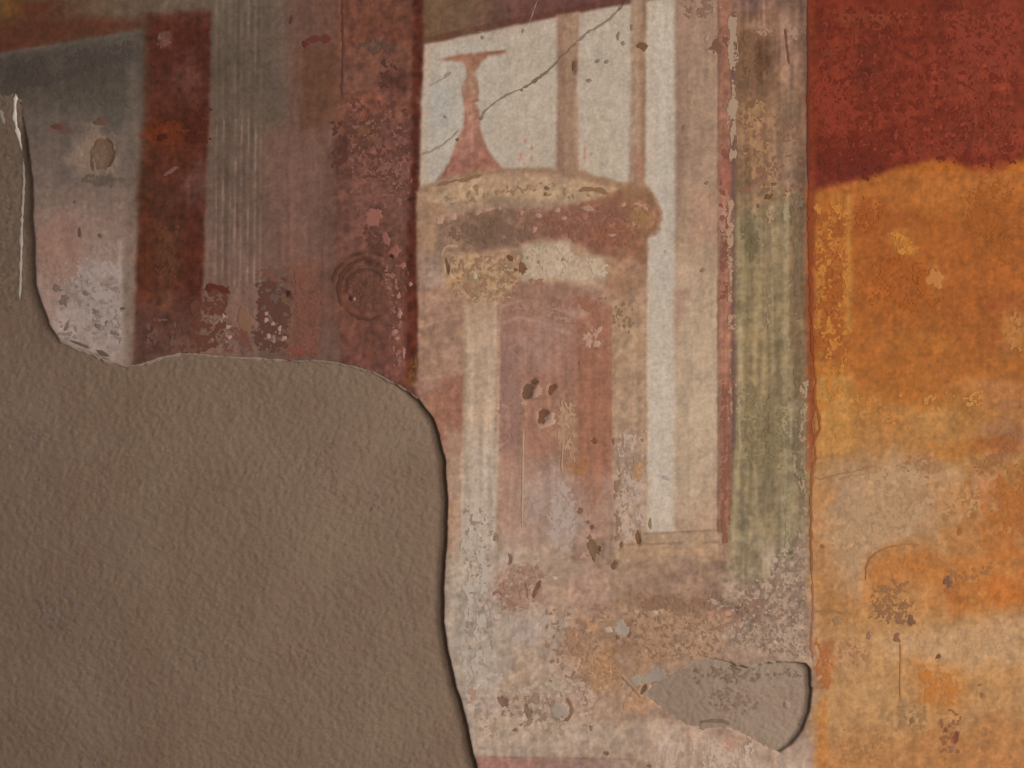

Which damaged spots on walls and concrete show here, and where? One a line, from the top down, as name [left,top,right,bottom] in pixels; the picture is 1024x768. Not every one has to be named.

crack [481,0,628,117]
peeling [330,38,413,370]
crack [422,130,459,155]
peeling [684,0,805,330]
peeling [52,273,125,348]
peeling [144,277,294,355]
spalling [482,200,988,742]
peeling [464,506,557,650]